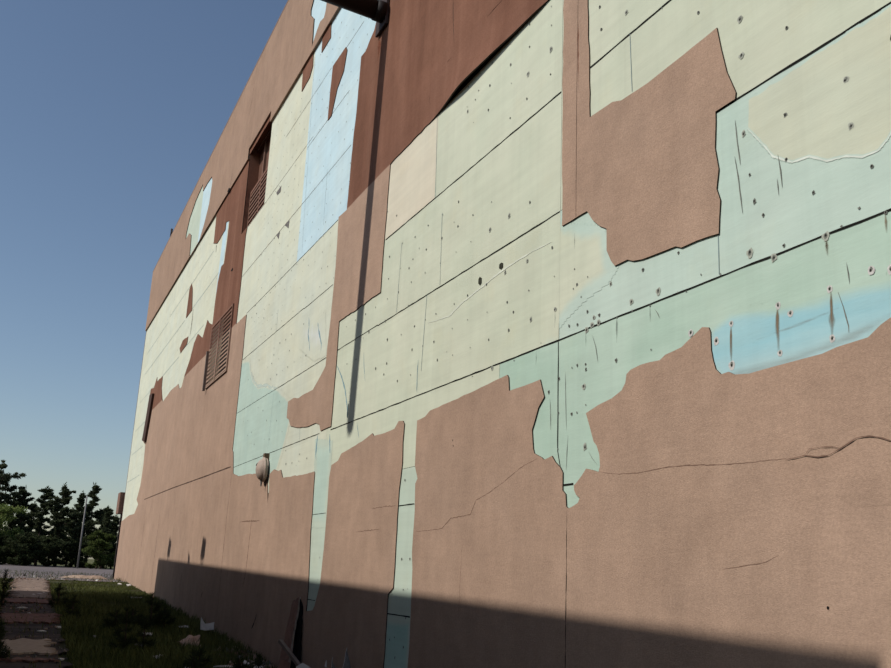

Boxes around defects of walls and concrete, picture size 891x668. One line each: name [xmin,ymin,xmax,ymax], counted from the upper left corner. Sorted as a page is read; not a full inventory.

peeling [122,0,891,619]
crack [603,435,891,474]
crack [415,460,534,532]